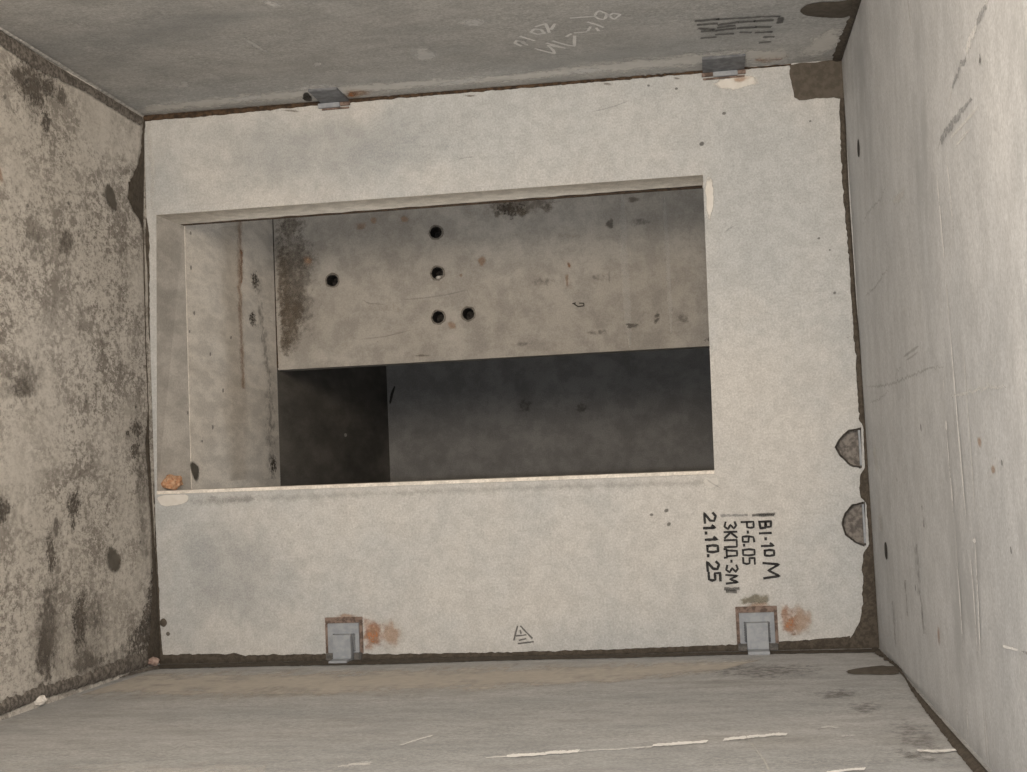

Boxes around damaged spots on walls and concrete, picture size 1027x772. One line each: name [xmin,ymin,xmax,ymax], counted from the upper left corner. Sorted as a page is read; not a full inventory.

leakage [10,57,67,132]
leakage [105,184,117,210]
leakage [58,232,73,254]
leakage [0,499,14,523]
leakage [46,490,82,571]
leakage [108,547,121,572]
leakage [37,587,57,681]
leakage [71,584,101,673]
leakage [127,569,153,654]